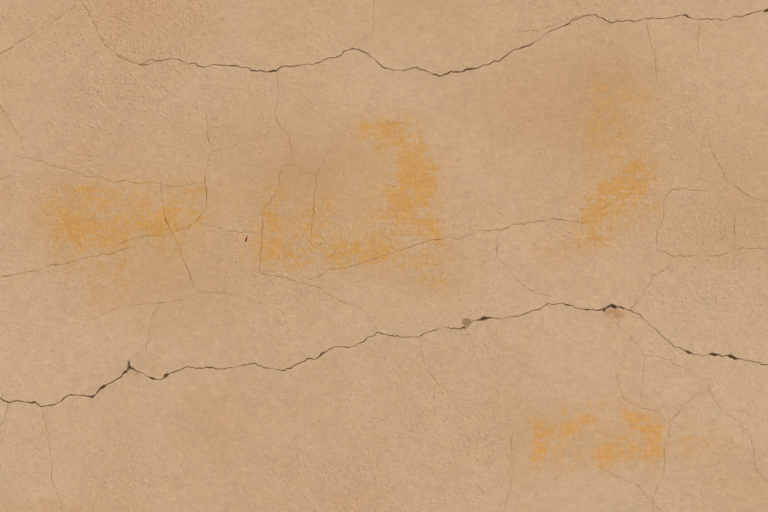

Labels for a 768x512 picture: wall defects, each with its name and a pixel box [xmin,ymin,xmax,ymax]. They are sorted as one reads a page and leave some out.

crack [45,0,768,154]
crack [0,113,768,511]